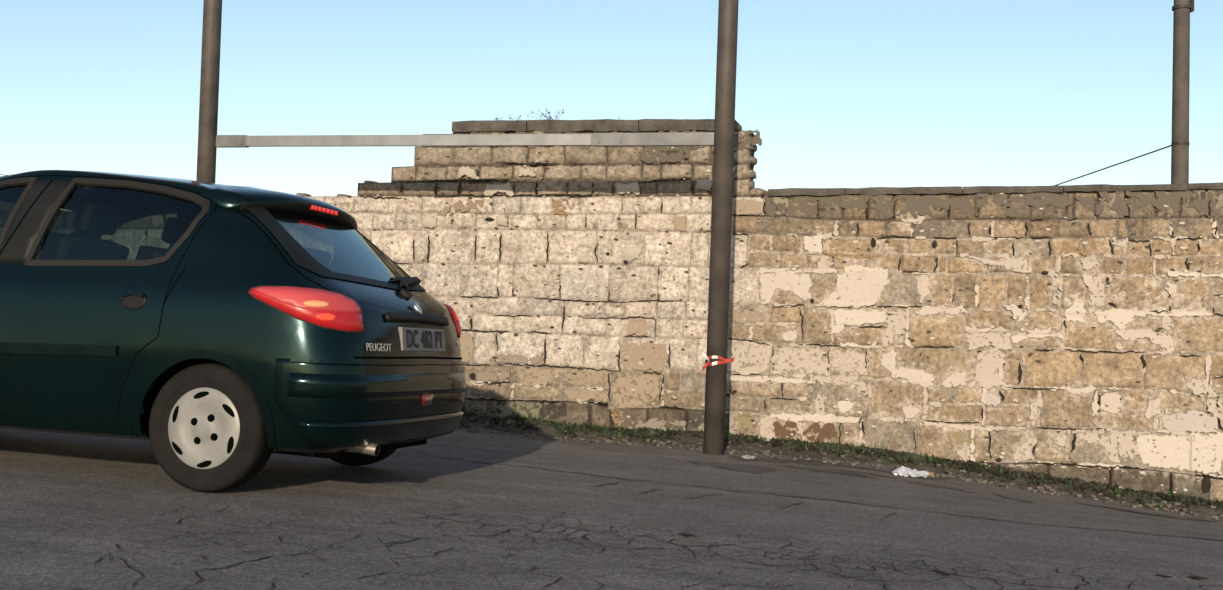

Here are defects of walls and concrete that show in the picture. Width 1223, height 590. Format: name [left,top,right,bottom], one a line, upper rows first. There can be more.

spalling [436,148,641,255]